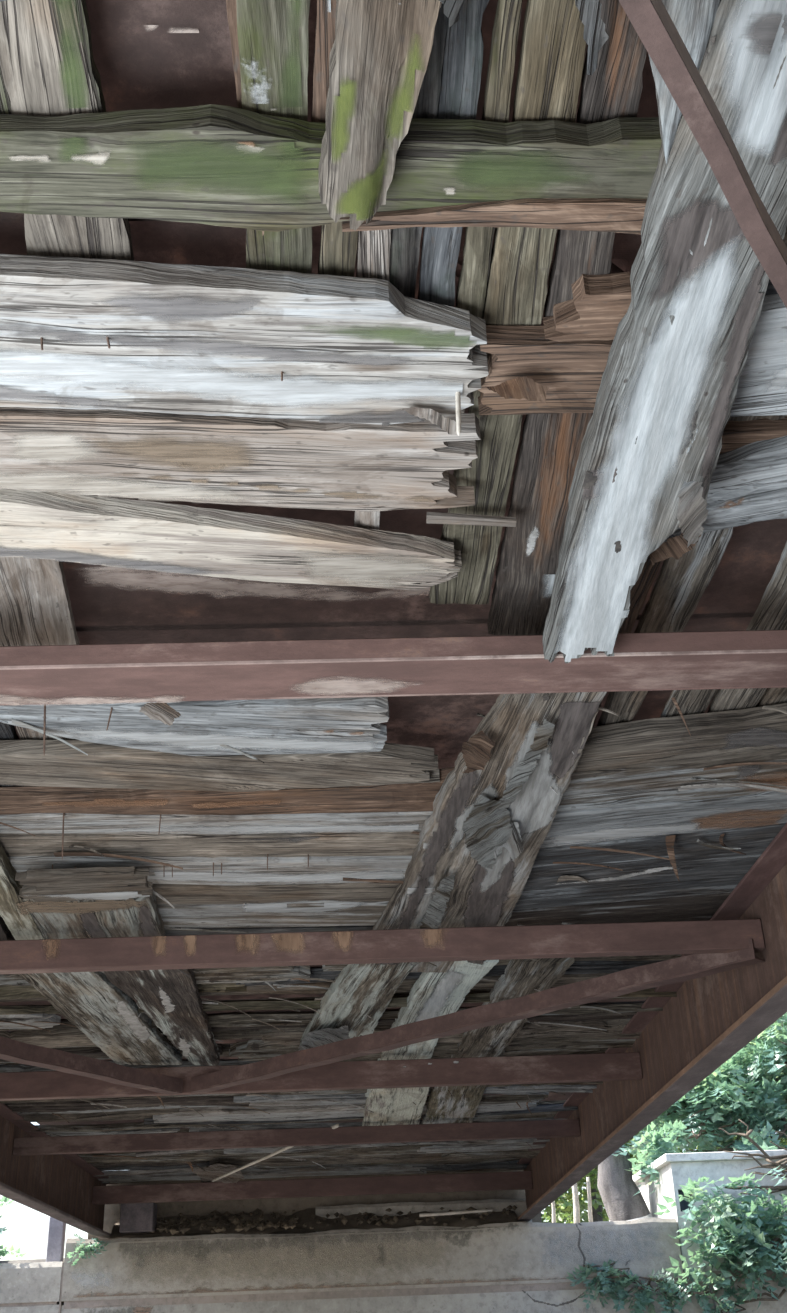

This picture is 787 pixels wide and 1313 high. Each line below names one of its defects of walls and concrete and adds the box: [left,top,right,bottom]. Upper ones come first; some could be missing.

corrosion [184,935,196,954]
corrosion [236,933,304,953]
corrosion [333,931,351,950]
corrosion [424,929,442,946]